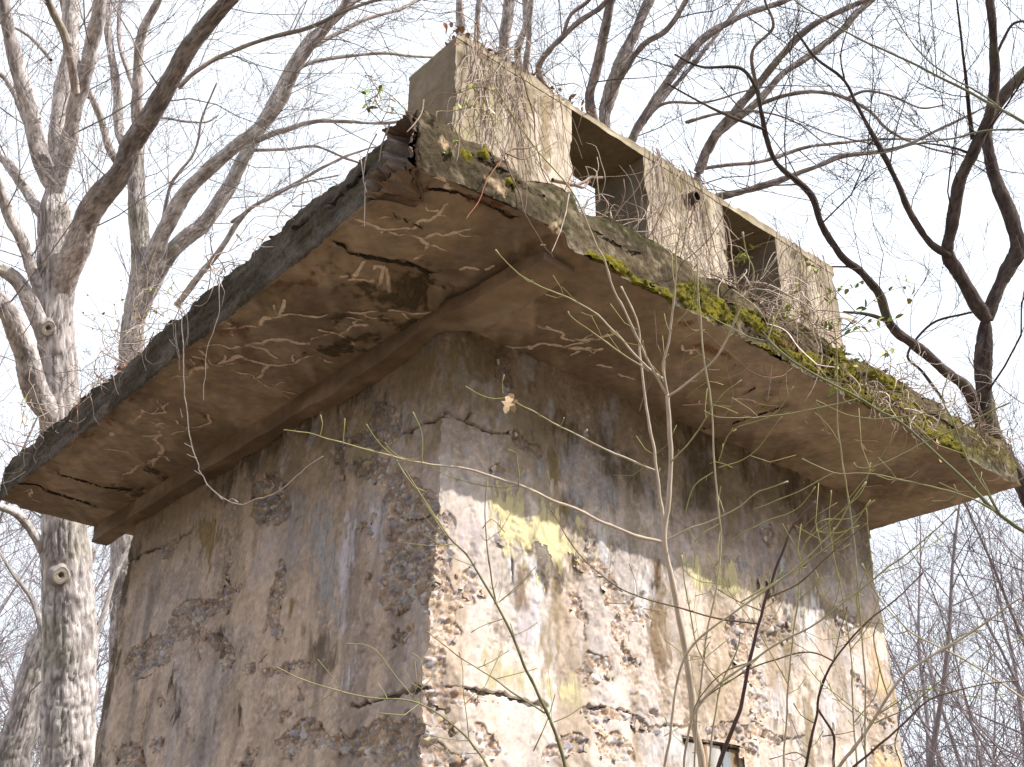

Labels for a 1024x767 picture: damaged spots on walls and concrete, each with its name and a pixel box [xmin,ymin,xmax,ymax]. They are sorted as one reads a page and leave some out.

spalling [361,111,421,200]
crack [333,241,439,275]
crack [409,414,504,435]
crack [16,471,148,508]
spalling [249,472,292,526]
spalling [123,560,311,682]
spalling [276,401,502,767]
spalling [568,527,651,685]
crack [355,685,540,707]
crack [588,706,670,729]